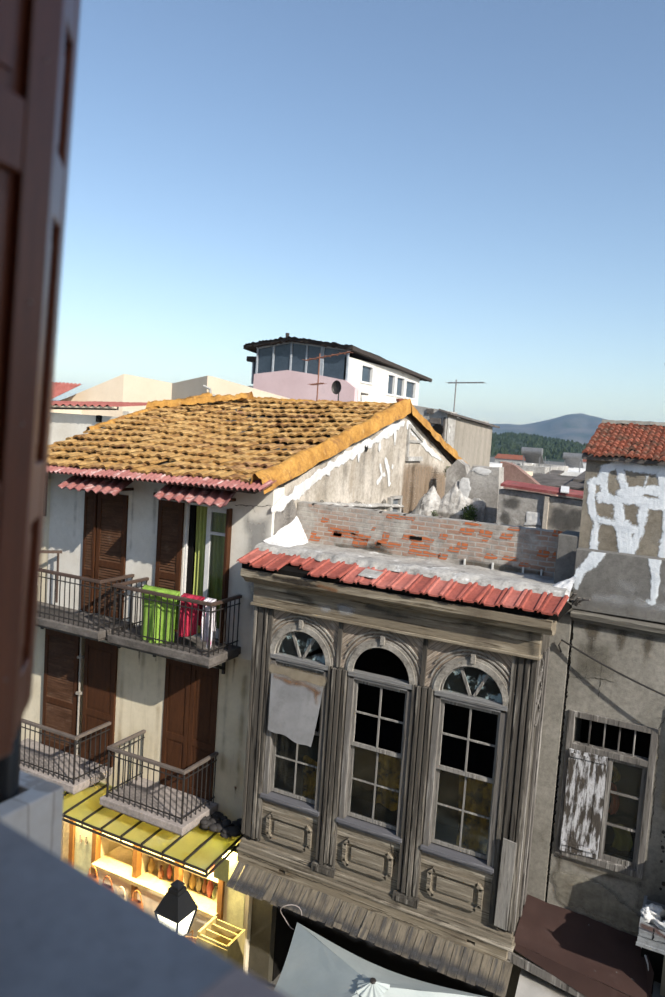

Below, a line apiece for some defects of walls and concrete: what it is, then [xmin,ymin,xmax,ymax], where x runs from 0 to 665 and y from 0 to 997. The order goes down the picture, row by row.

flaking render [354,500,415,521]
flaking render [309,512,556,567]
crack [650,717,665,838]